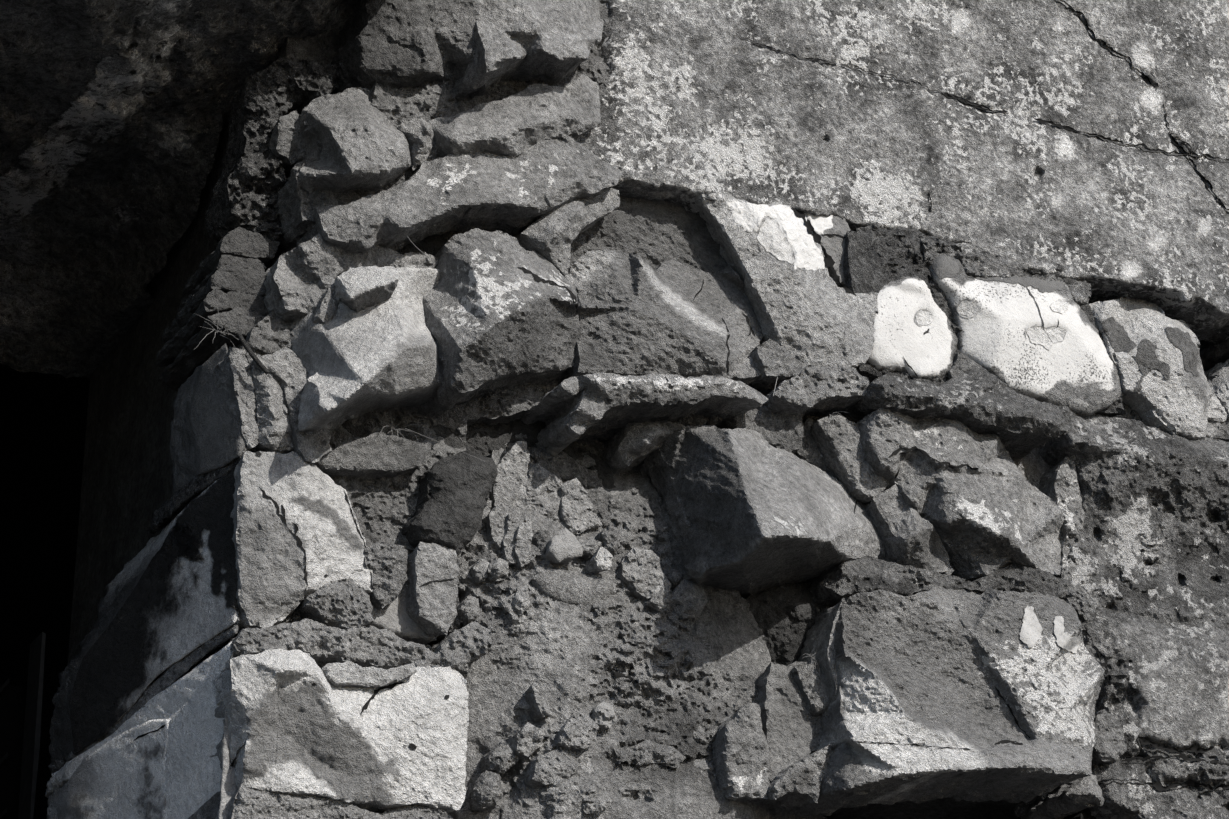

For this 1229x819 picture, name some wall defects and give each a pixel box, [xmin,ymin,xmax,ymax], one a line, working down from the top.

crack [735,0,1229,213]
peeling [757,218,795,264]
crack [792,207,856,295]
spalling [331,266,400,317]
peeling [914,309,933,327]
peeling [957,299,979,318]
peeling [967,275,1069,350]
peeling [1069,397,1089,413]
crack [259,487,308,591]
peeling [481,441,533,569]
spalling [786,583,1105,817]